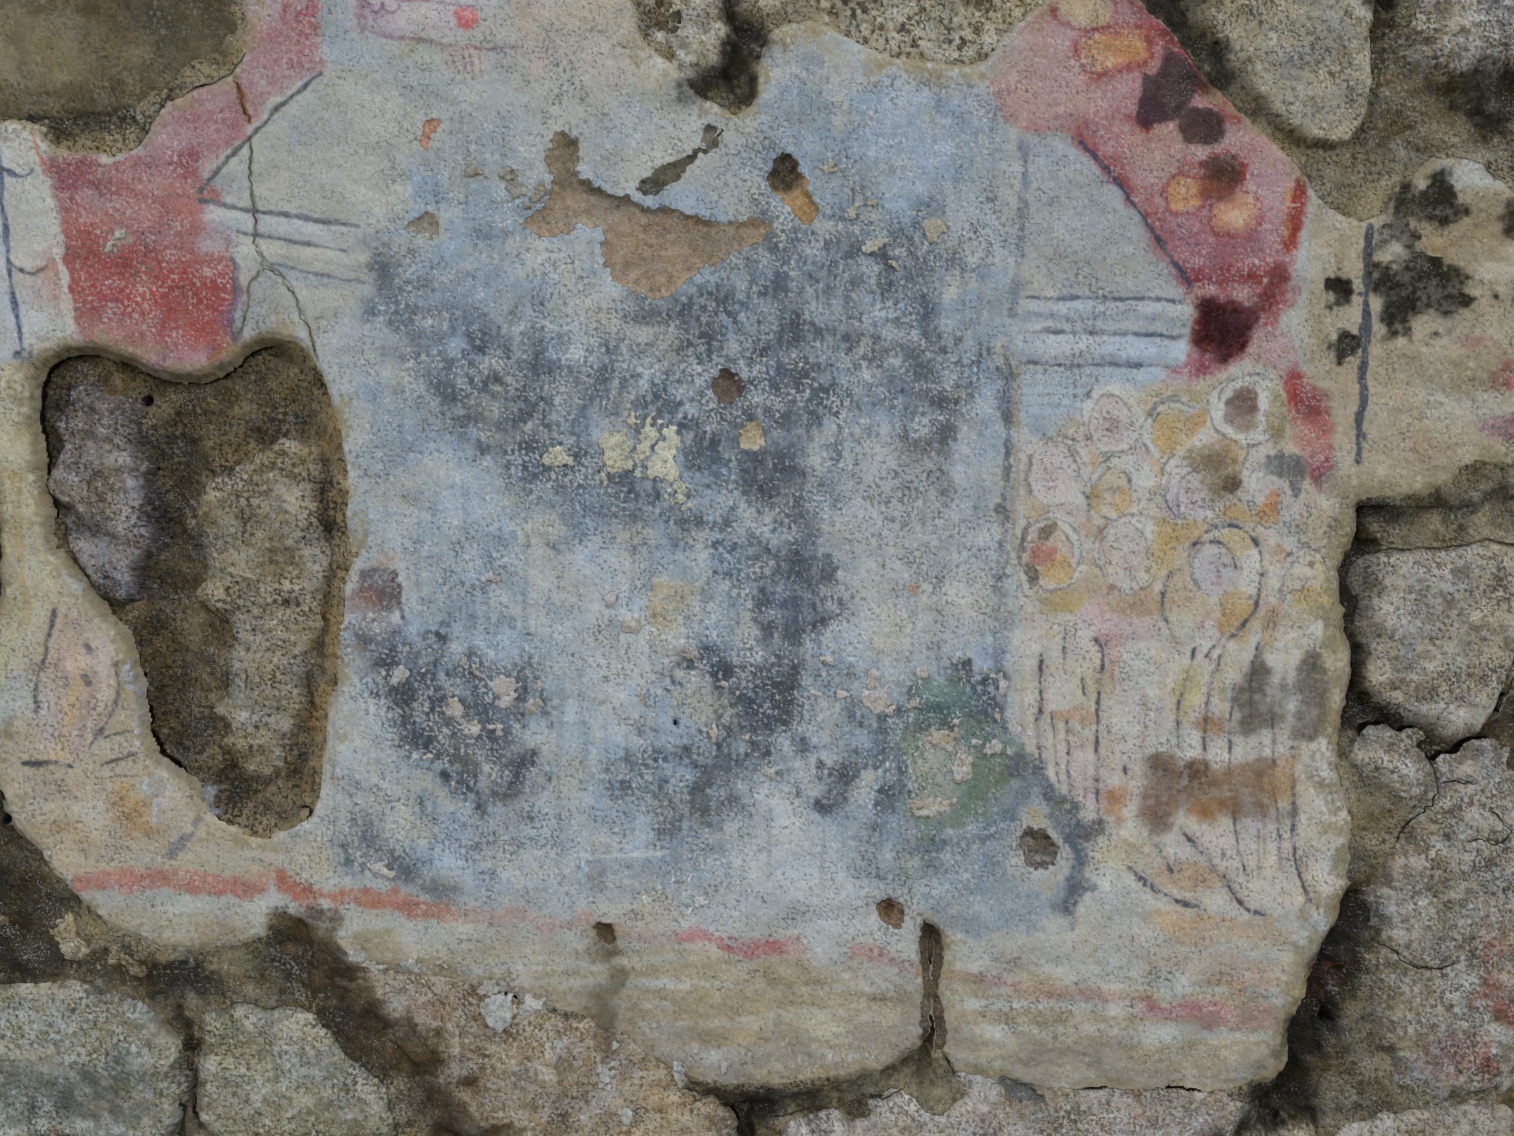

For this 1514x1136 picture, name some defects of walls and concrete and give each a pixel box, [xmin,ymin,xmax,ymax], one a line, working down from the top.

leakage [678,0,770,100]
spalling [464,124,773,299]
spalling [767,152,841,225]
peeling [857,236,900,272]
peeling [922,217,947,244]
leakage [1371,167,1499,340]
spalling [44,343,383,839]
peeling [369,665,425,698]
peeling [442,656,544,737]
peeling [366,860,398,880]
leakage [285,907,515,1136]